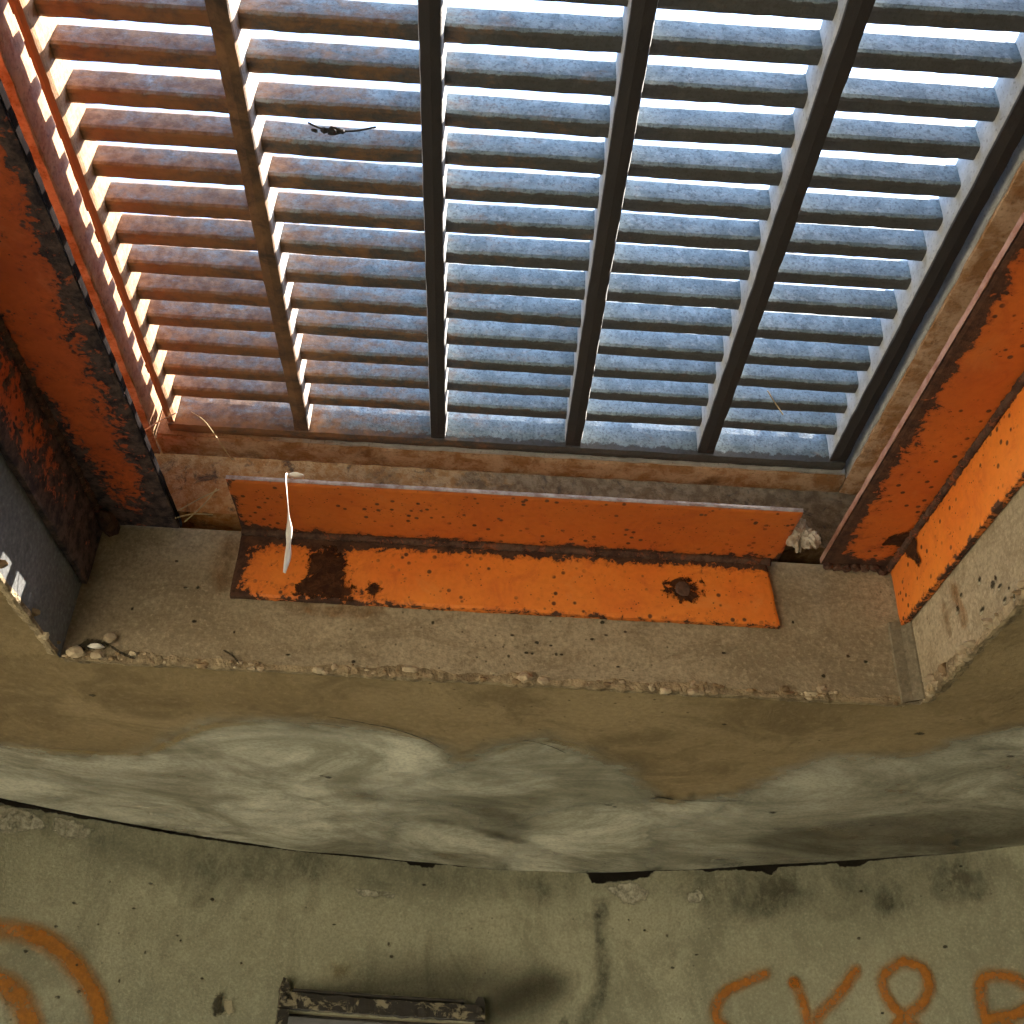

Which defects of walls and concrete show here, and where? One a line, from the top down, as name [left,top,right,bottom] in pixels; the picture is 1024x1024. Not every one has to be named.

corrosion [882,530,921,567]
corrosion [292,545,384,601]
corrosion [661,577,706,604]